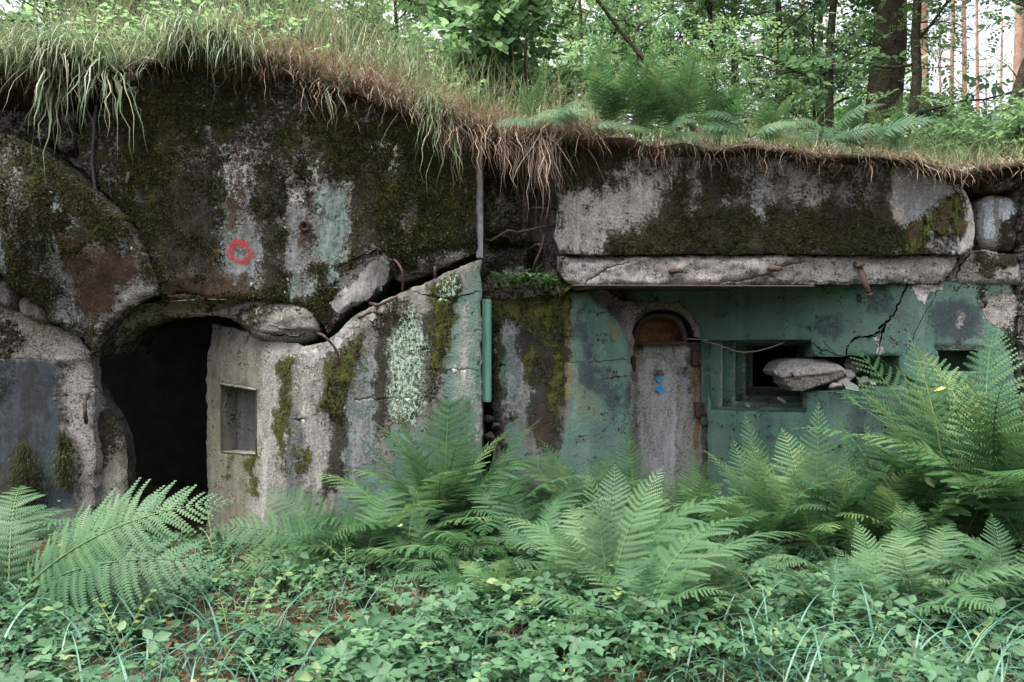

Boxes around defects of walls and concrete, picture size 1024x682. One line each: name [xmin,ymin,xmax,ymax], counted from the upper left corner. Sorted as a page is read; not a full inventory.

rust [297,181,315,248]
crack [339,249,421,274]
spalling [556,184,1019,512]
crack [813,286,908,356]
leakage [492,319,572,464]